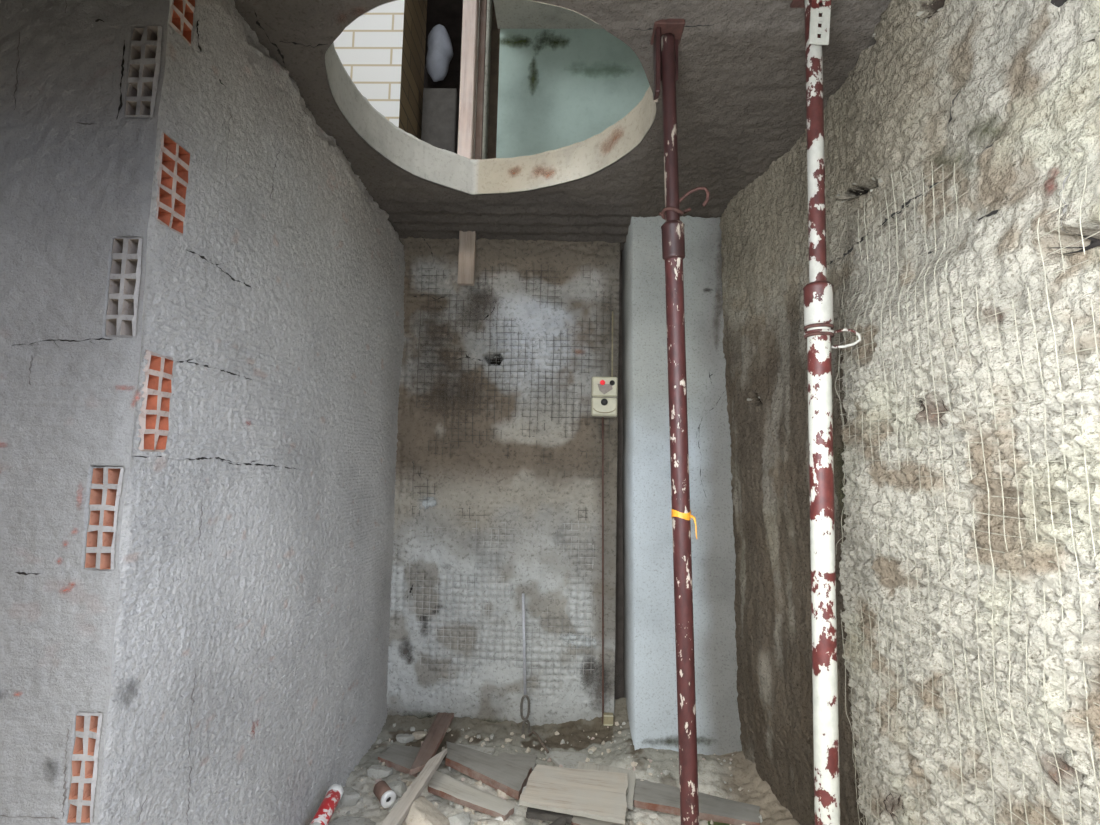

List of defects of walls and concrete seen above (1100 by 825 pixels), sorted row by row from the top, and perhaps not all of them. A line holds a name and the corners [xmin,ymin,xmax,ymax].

crack [187,250,251,288]
crack [18,338,111,385]
crack [179,359,252,380]
spalling [908,398,948,422]
crack [189,457,296,469]
leakage [583,657,613,705]
spalling [1046,758,1076,784]